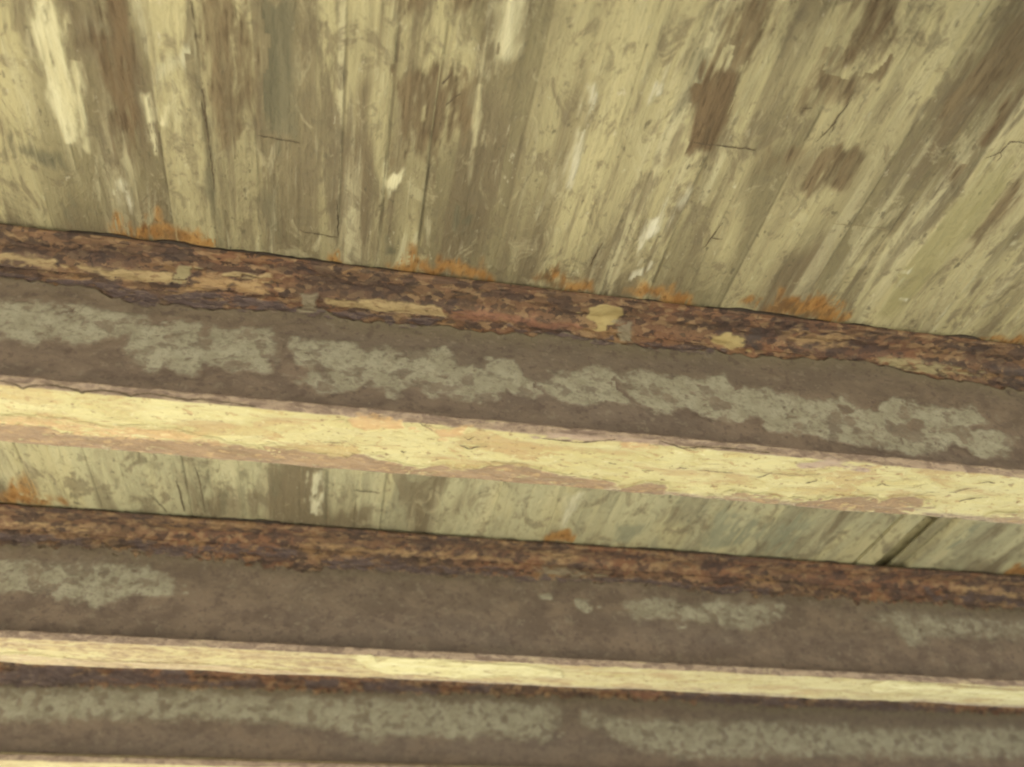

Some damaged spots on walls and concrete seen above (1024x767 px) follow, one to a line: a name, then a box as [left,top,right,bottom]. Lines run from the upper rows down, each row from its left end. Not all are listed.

water stain [0,123,88,231]
water stain [65,0,162,193]
corrosion [100,199,227,248]
water stain [184,0,310,249]
water stain [382,0,509,192]
water stain [645,0,795,173]
water stain [753,0,1024,329]
corrosion [0,250,702,344]
corrosion [708,279,868,354]
corrosion [874,350,988,380]
corrosion [0,519,110,536]
corrosion [300,525,618,579]